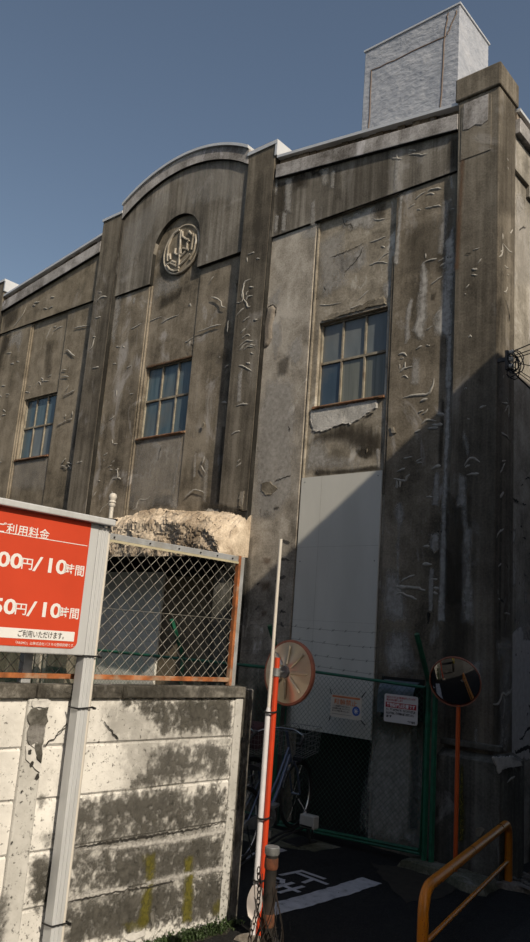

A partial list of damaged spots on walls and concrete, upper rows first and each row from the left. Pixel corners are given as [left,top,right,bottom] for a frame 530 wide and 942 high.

water stain [308,426,380,475]
spalling [25,700,51,773]
peeling [492,627,530,774]
water stain [64,685,290,942]